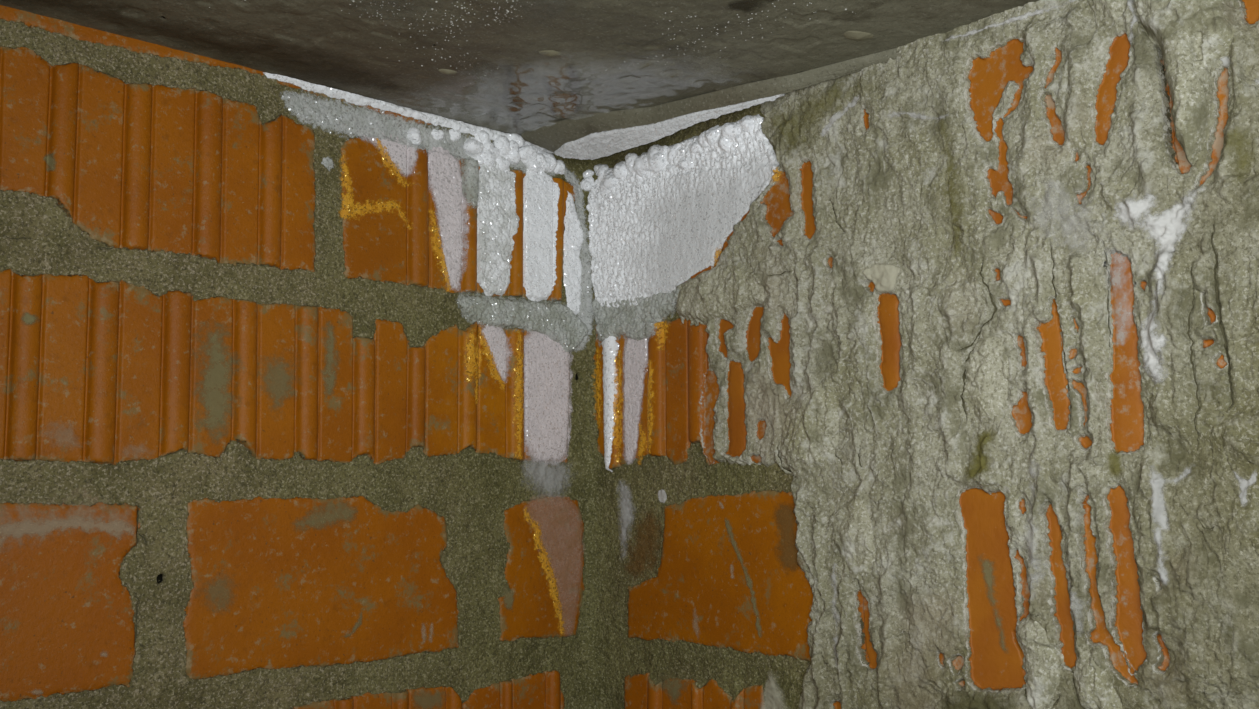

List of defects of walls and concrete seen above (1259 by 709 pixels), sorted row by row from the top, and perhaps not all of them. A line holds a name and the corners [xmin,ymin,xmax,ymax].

spalling [963,37,1092,226]
spalling [1091,33,1132,147]
crack [1161,65,1178,168]
spalling [699,306,792,465]
spalling [862,279,902,394]
crack [960,262,997,418]
crack [1051,252,1071,420]
crack [1103,243,1111,347]
spalling [1105,249,1147,454]
leakage [1115,189,1203,381]
crack [1187,225,1233,441]
spalling [937,485,1170,692]